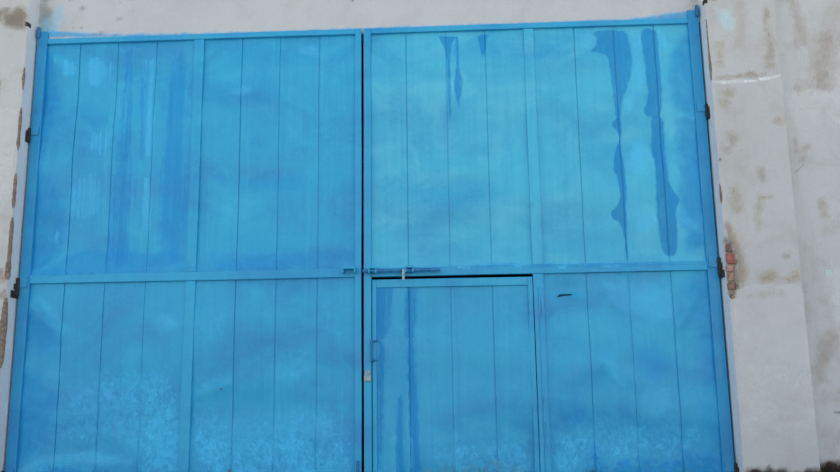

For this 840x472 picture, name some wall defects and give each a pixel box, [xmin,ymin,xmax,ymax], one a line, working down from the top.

flaking render [725,224,746,300]
leakage [804,461,840,472]